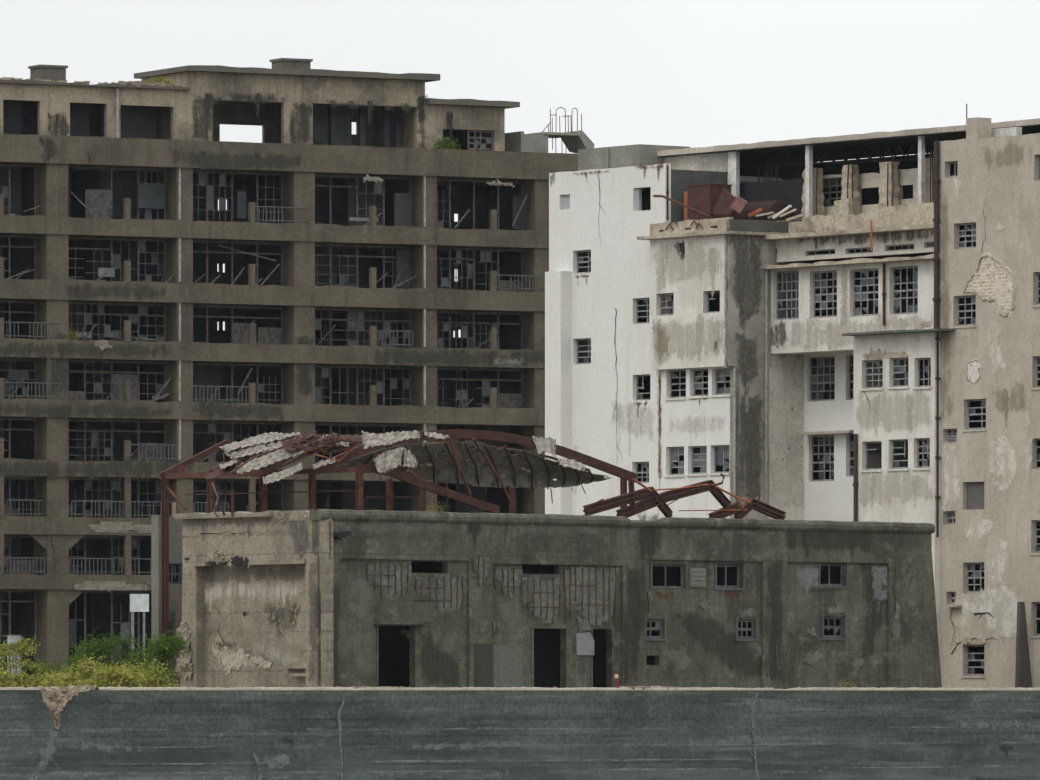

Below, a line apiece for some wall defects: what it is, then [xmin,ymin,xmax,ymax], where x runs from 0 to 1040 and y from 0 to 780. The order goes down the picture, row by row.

damp [729,230,771,499]
damp [770,321,786,347]
flaking render [963,252,1017,384]
rust [636,372,661,477]
spalling [264,601,298,624]
spalling [365,554,619,633]
flaking render [212,638,272,675]
peeling [38,685,96,719]
crack [324,698,345,780]